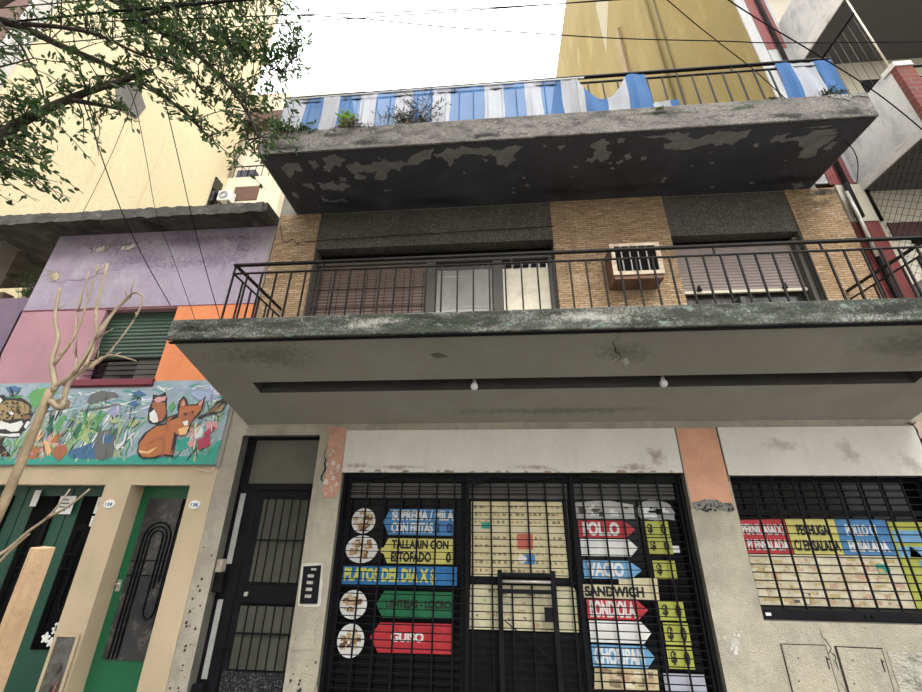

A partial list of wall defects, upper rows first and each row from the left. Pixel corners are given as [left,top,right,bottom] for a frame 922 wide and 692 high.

peeling [281,145,522,207]
peeling [572,138,647,177]
peeling [644,129,759,165]
peeling [323,426,347,498]
crack [819,628,846,692]